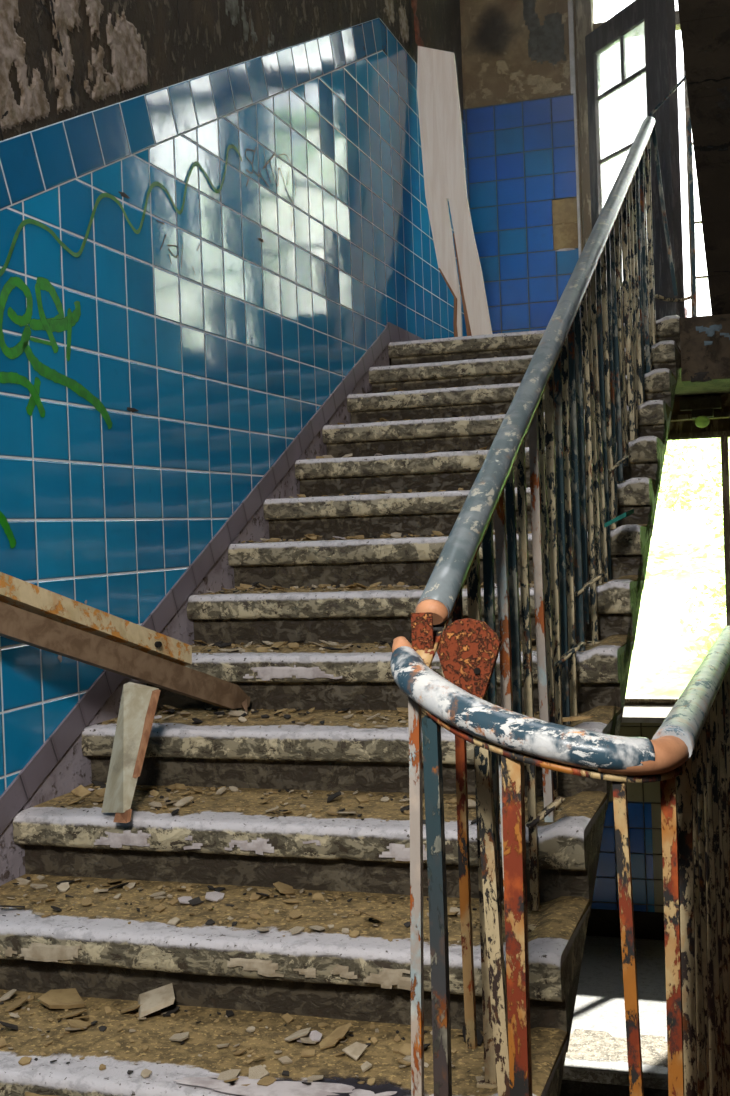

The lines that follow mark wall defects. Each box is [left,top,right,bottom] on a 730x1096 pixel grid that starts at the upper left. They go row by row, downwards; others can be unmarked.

leakage [471,11,513,54]
peeling [0,0,148,131]
peeling [552,198,578,251]